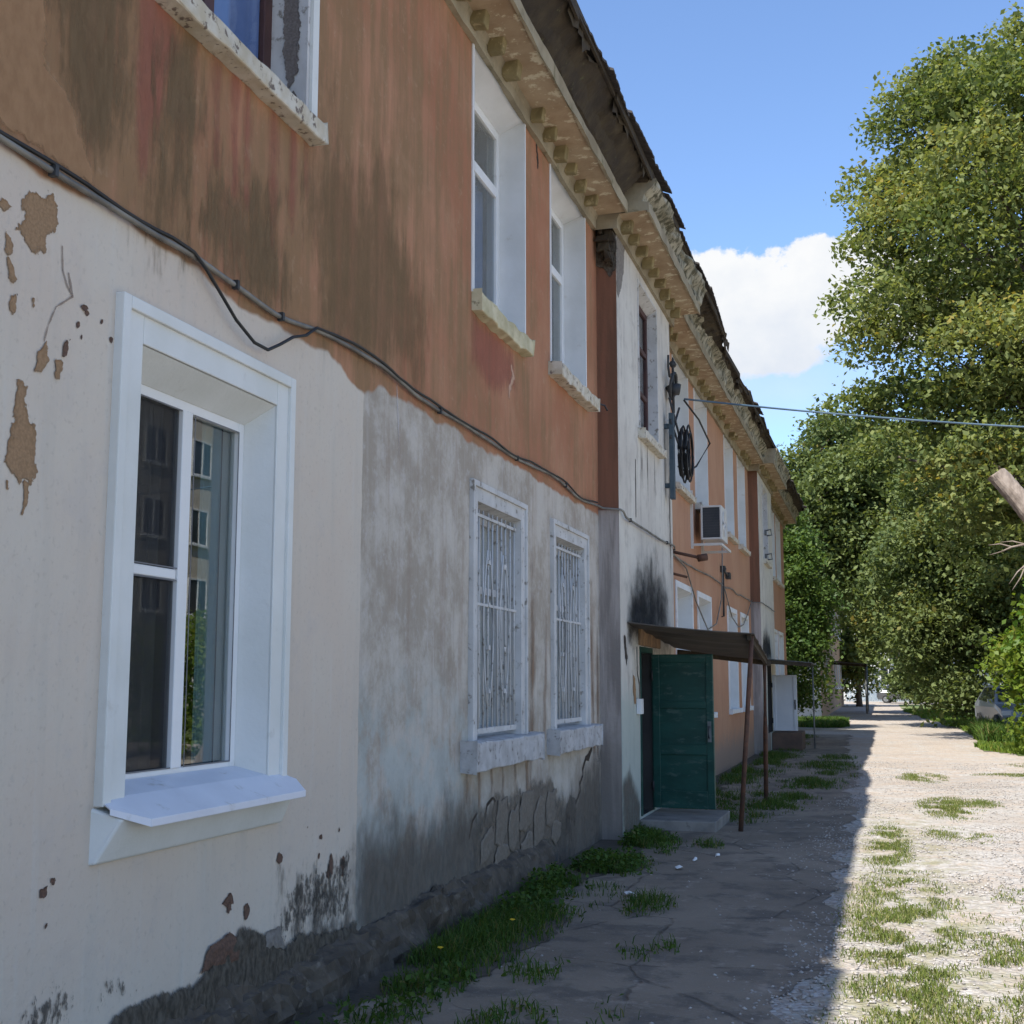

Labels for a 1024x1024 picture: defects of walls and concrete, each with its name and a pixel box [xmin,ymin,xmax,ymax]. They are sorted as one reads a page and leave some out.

peeling [0,190,59,315]
crack [44,246,74,341]
peeling [34,305,89,379]
peeling [4,379,38,515]
damp [280,797,495,950]
flaking render [475,780,562,871]
damp [547,763,601,866]
crack [567,747,592,834]
flaking render [113,893,357,1024]